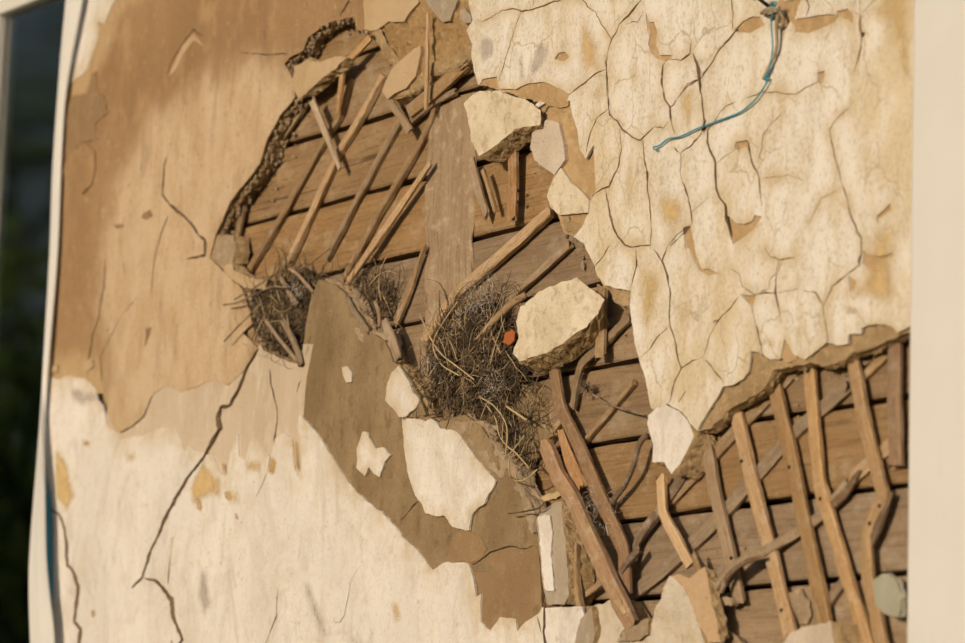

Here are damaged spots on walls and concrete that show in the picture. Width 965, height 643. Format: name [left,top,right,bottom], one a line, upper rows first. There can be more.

flaking render [779,0,853,33]
crack [853,0,874,72]
crack [121,397,152,433]
crack [88,158,207,379]
flaking render [48,0,571,630]
flaking render [481,77,595,236]
flaking render [601,281,631,309]
crack [477,0,862,405]
flaking render [700,324,910,435]
crack [132,349,300,643]
crack [51,509,82,643]
peeling [872,573,907,619]